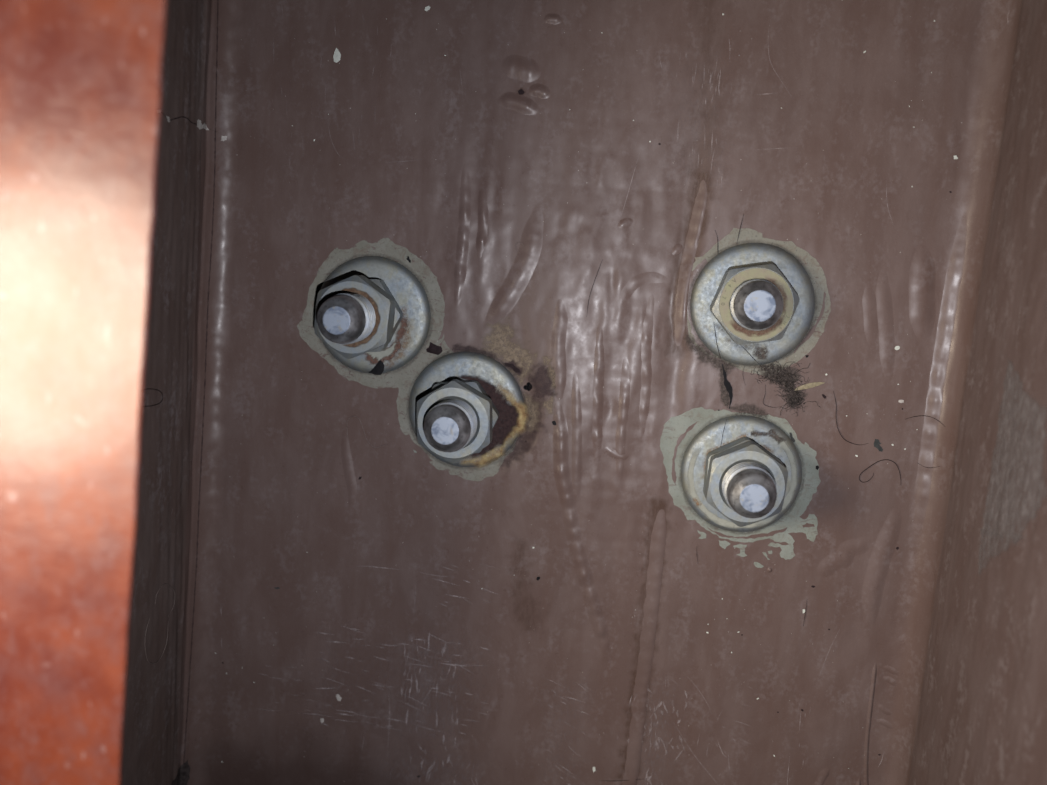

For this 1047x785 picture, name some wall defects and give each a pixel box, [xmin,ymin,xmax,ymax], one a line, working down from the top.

corrosion [332,288,409,364]
peeling [297,238,516,481]
corrosion [453,323,556,465]
peeling [660,407,821,568]